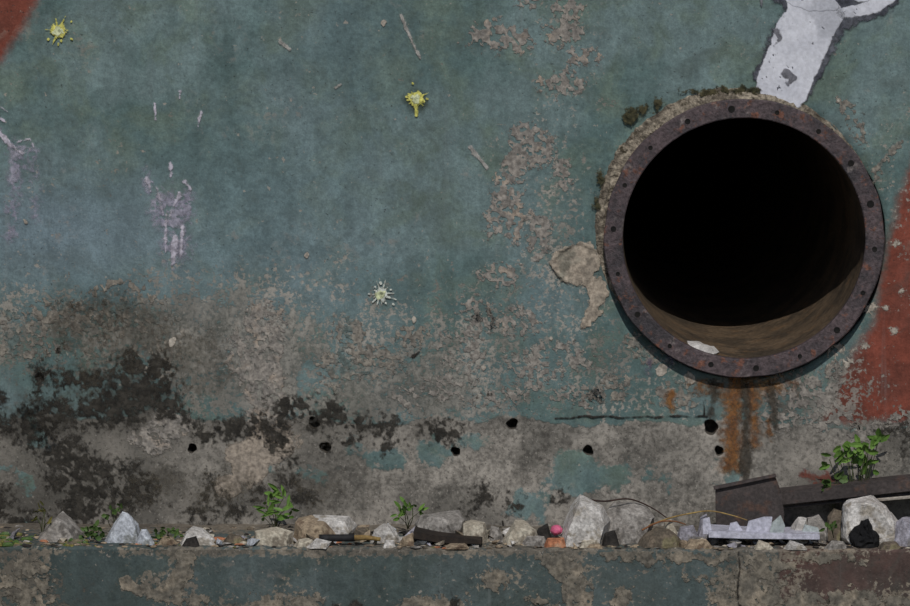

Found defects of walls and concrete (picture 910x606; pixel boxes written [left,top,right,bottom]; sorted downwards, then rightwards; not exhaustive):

peeling [457,0,604,102]
peeling [482,121,609,329]
water stain [0,349,465,525]
peeling [315,261,637,414]
peeling [622,330,706,409]
rust [695,377,799,473]
peeling [756,343,910,442]
water stain [457,481,528,517]
peeling [0,553,58,606]
peeling [119,549,211,606]
peeling [523,551,595,606]
peeling [599,551,910,606]